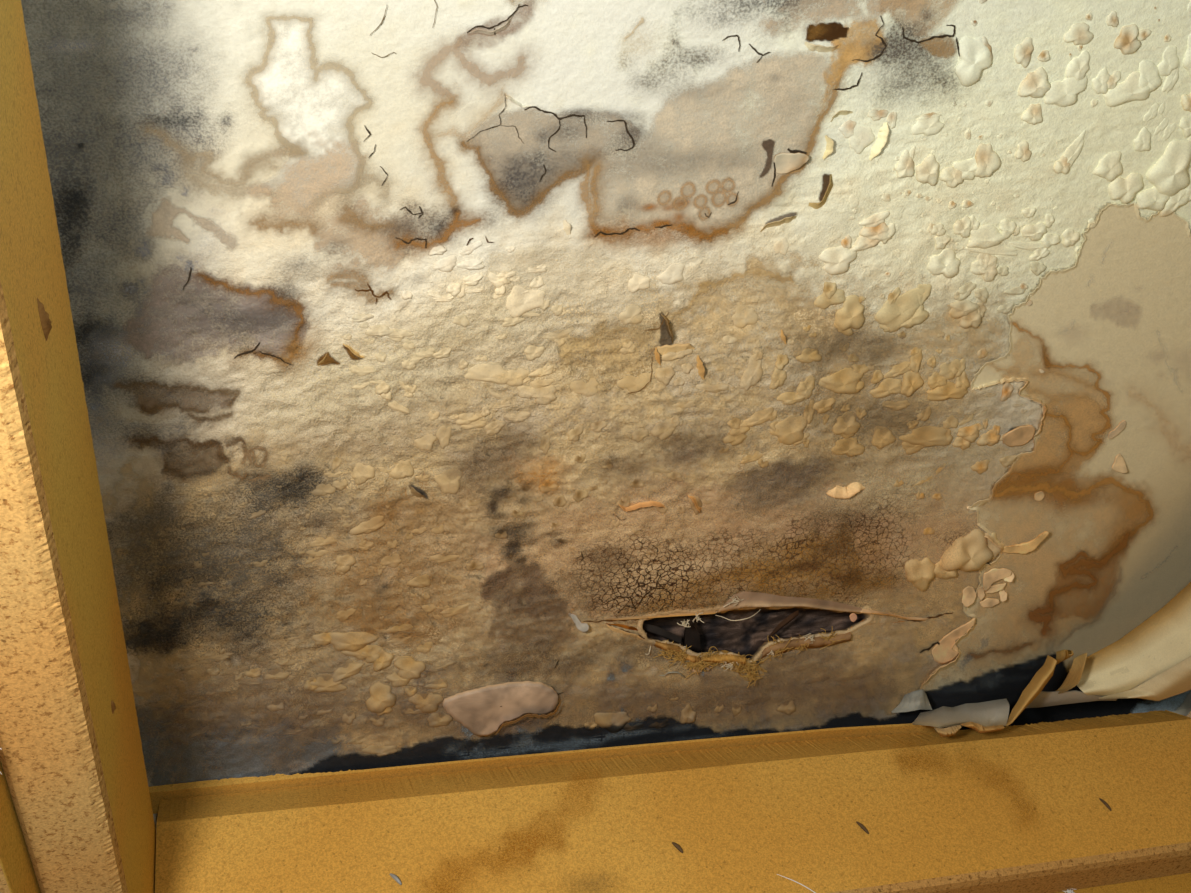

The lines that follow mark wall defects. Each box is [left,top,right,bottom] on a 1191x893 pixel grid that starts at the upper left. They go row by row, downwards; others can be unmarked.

crack [466,93,635,181]
peeling [760,135,834,186]
peeling [869,122,889,160]
peeling [808,174,833,209]
peeling [760,213,796,232]
damp [30,0,1068,786]
peeling [918,201,1191,708]
damp [994,322,1153,636]
crack [583,514,688,640]
peeling [568,613,589,632]
peeling [442,681,562,736]
damp [1008,690,1190,726]